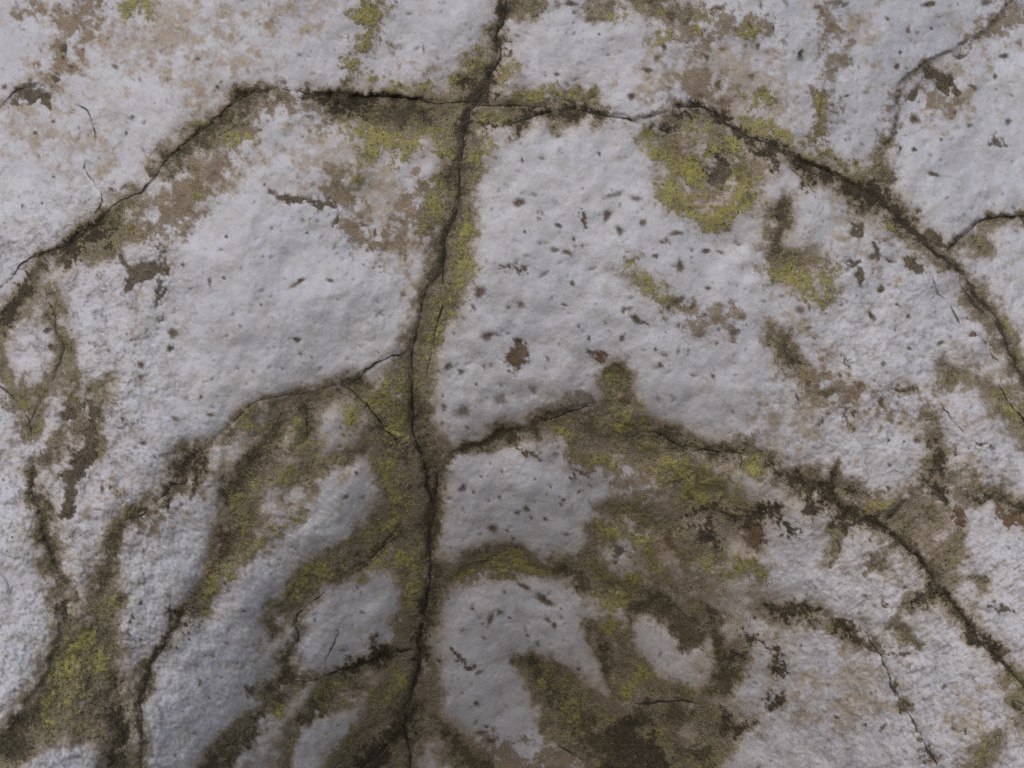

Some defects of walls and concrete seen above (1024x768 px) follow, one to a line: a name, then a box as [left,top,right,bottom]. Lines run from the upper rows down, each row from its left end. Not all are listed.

crack [0,95,248,287]
water stain [135,96,325,242]
crack [0,305,64,440]
crack [230,2,821,768]
water stain [682,297,745,342]
water stain [805,358,906,429]
crack [848,181,1024,421]
water stain [913,243,1008,321]
crack [830,476,1024,688]
water stain [324,549,586,768]
water stain [527,618,716,768]
crack [841,618,937,764]